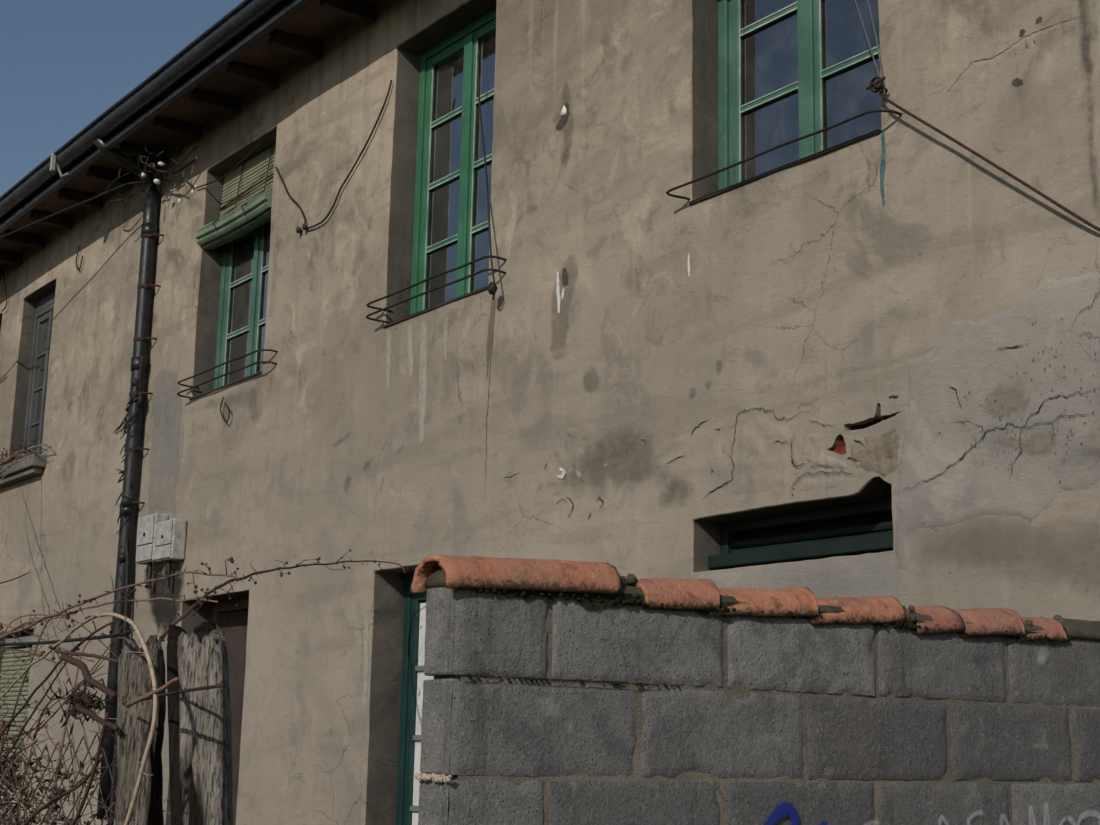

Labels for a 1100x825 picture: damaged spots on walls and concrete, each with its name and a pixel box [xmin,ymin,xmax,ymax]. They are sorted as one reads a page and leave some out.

efflorescence [409,323,427,442]
crack [639,398,865,499]
spalling [827,403,900,455]
crack [894,385,1097,492]